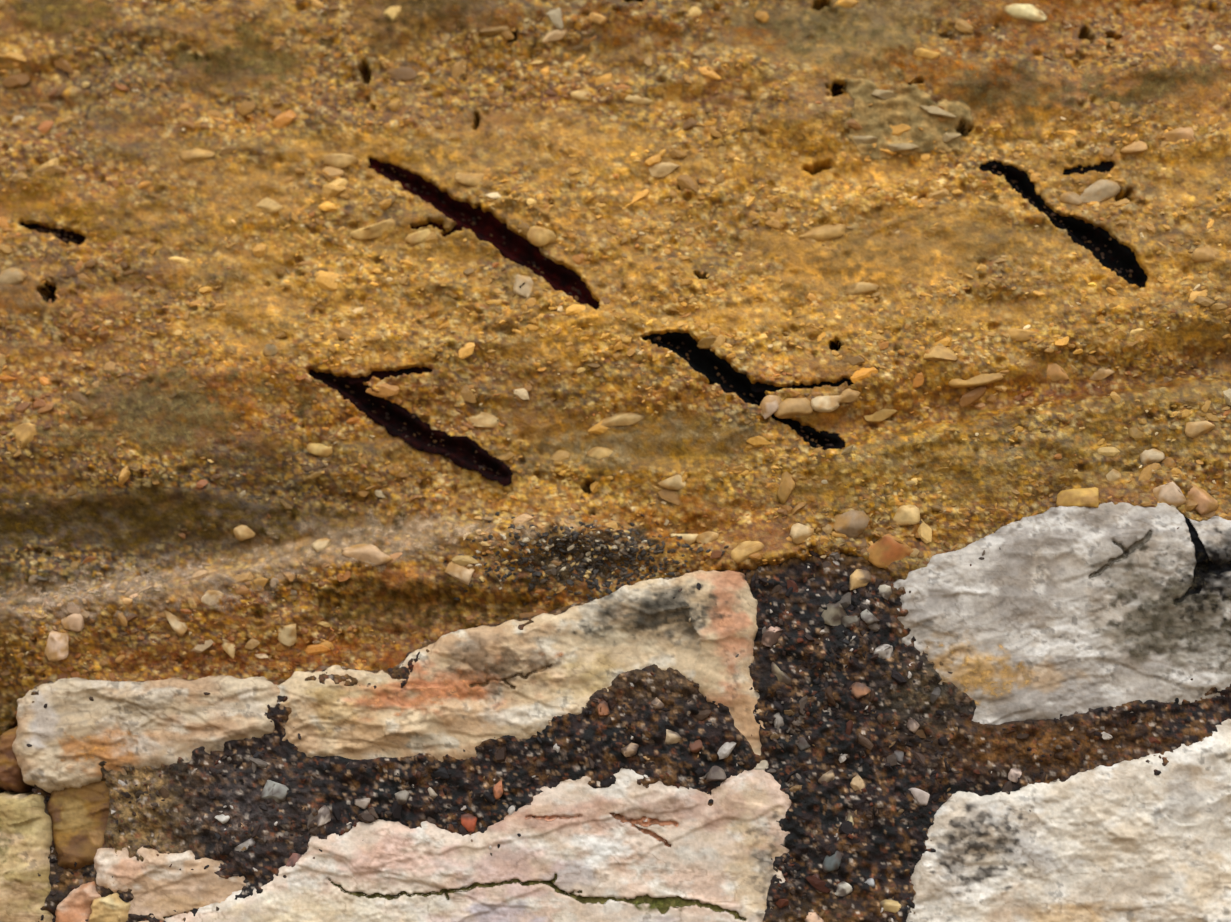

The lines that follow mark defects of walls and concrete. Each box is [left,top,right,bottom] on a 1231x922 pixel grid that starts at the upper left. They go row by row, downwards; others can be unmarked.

crack [368,158,599,310]
crack [979,161,1148,288]
crack [309,367,513,486]
crack [642,332,854,450]